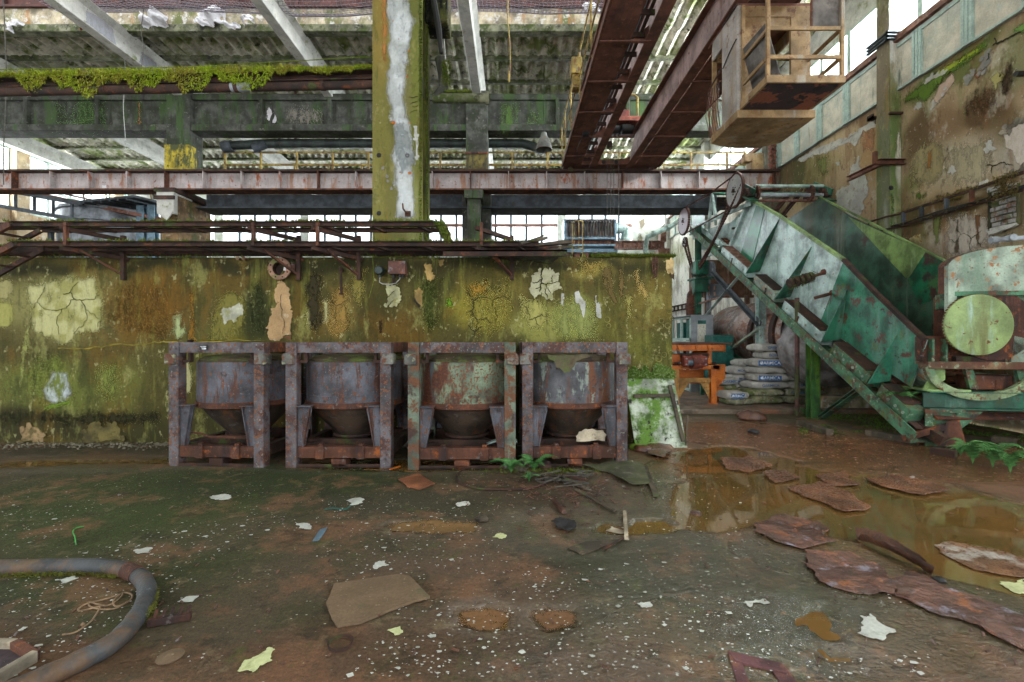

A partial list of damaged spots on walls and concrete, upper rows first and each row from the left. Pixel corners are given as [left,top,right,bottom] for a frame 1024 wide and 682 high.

peeling [914,69,948,110]
peeling [963,48,991,86]
crack [34,282,101,334]
peeling [220,303,243,325]
flaking render [266,281,293,341]
leakage [305,271,323,330]
flaking render [529,268,599,312]
leakage [0,373,159,426]